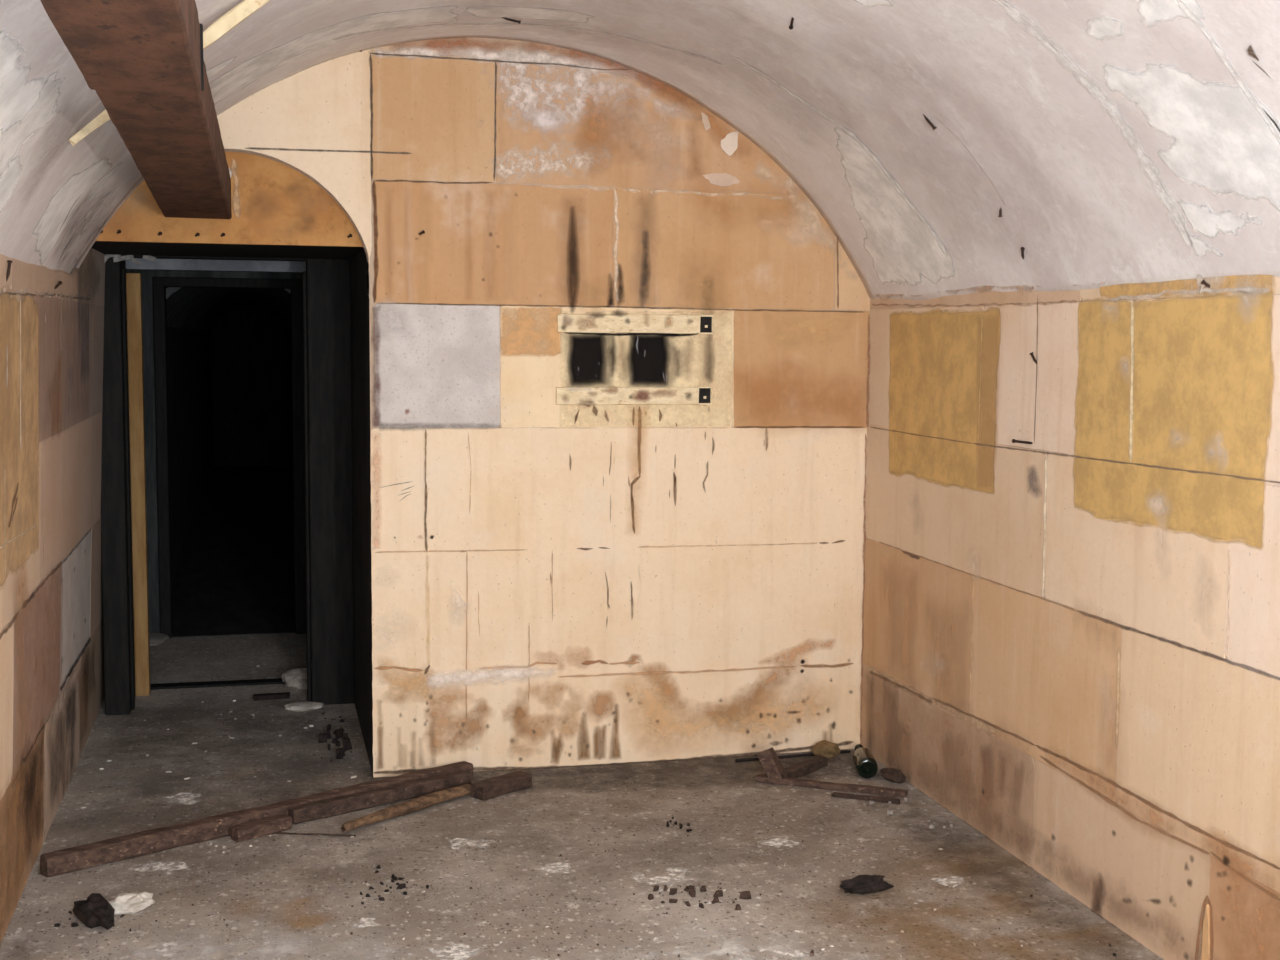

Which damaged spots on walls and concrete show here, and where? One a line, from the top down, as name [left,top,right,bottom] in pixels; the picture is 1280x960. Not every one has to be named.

peeling [1139,0,1203,26]
damp [378,46,636,178]
peeling [1105,65,1280,256]
crack [229,53,1280,771]
damp [0,670,77,930]
crack [374,767,421,775]
damp [393,669,538,748]
damp [513,642,841,785]